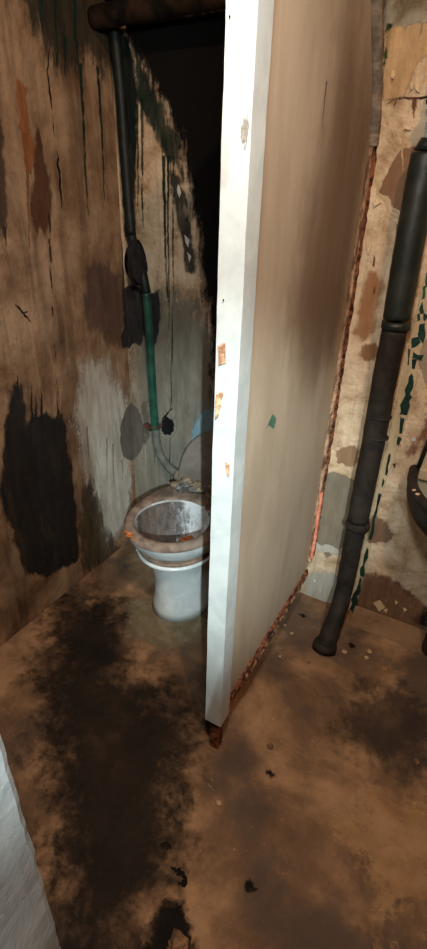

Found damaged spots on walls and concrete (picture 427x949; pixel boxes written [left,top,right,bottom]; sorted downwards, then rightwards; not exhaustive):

peeling [383,22,427,100]
damp [0,121,8,244]
damp [26,0,215,503]
peeling [353,235,383,340]
damp [0,376,121,577]
peeling [350,274,427,612]